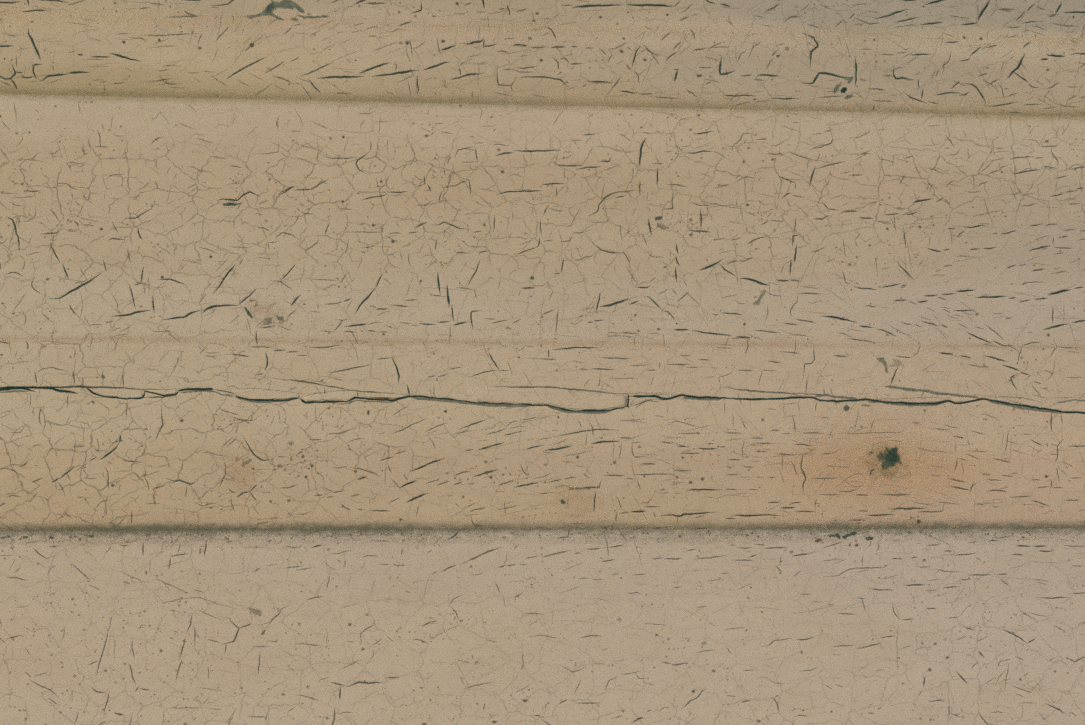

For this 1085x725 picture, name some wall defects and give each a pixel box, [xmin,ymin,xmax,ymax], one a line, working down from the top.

crack [0,0,138,89]
crack [205,58,280,78]
crack [309,0,1085,113]
crack [0,210,147,314]
crack [107,261,254,323]
crack [219,131,1085,389]
crack [0,435,133,506]
crack [286,417,1084,559]
crack [837,540,1081,648]
crack [77,639,148,725]
crack [177,613,280,675]
crack [332,677,396,725]